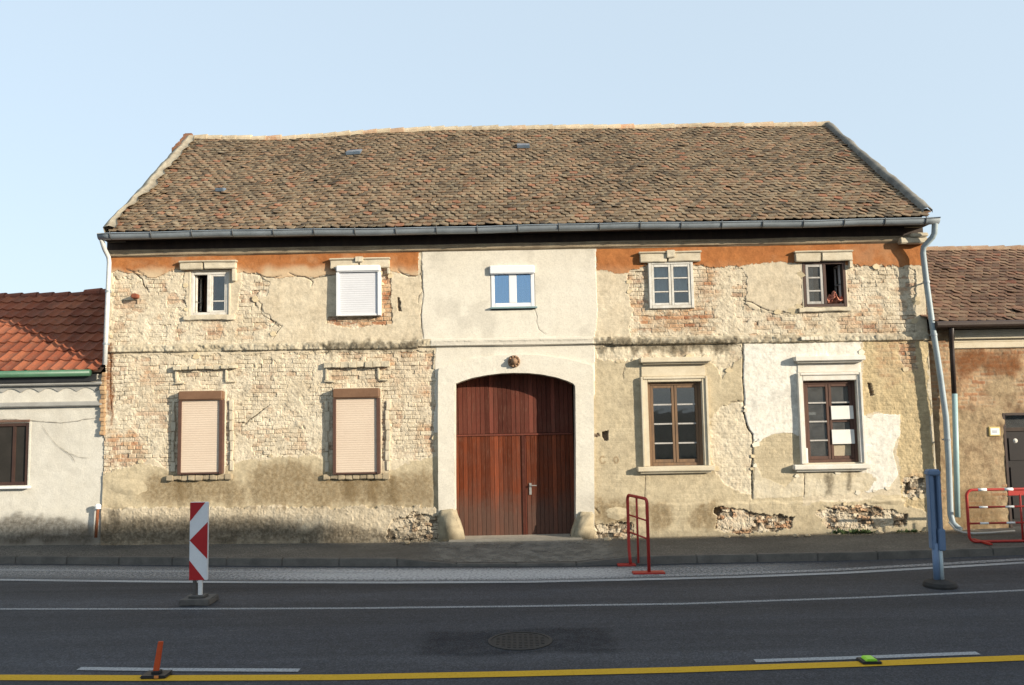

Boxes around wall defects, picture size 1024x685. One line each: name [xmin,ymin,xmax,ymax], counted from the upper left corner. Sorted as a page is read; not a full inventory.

crack [251,273,332,334]
flaking render [103,267,438,475]
flaking render [595,263,927,535]
crack [733,345,757,520]
damp [104,510,190,543]
damp [209,521,426,543]
flaking render [385,511,439,542]